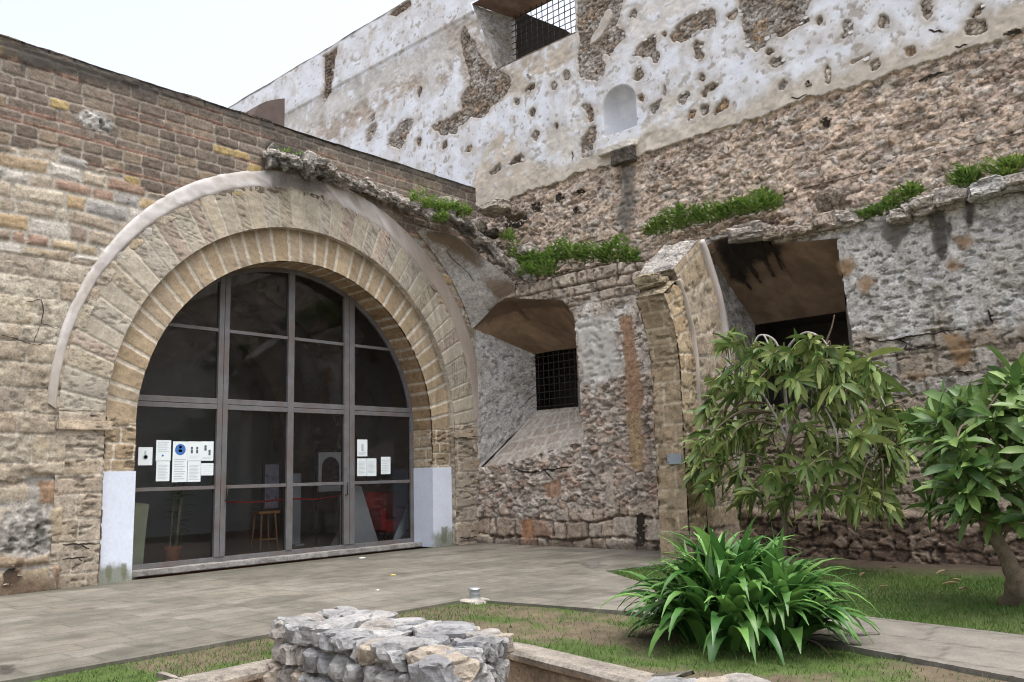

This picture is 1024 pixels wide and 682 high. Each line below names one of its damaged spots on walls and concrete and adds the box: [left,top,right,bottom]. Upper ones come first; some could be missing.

flaking render [552,0,637,90]
flaking render [632,0,823,81]
flaking render [324,49,337,101]
flaking render [433,27,535,150]
flaking render [389,119,421,149]
water stain [882,219,908,248]
water stain [929,210,951,259]
water stain [966,201,975,224]
water stain [715,238,786,290]
crack [2,299,57,345]
crack [514,466,572,479]